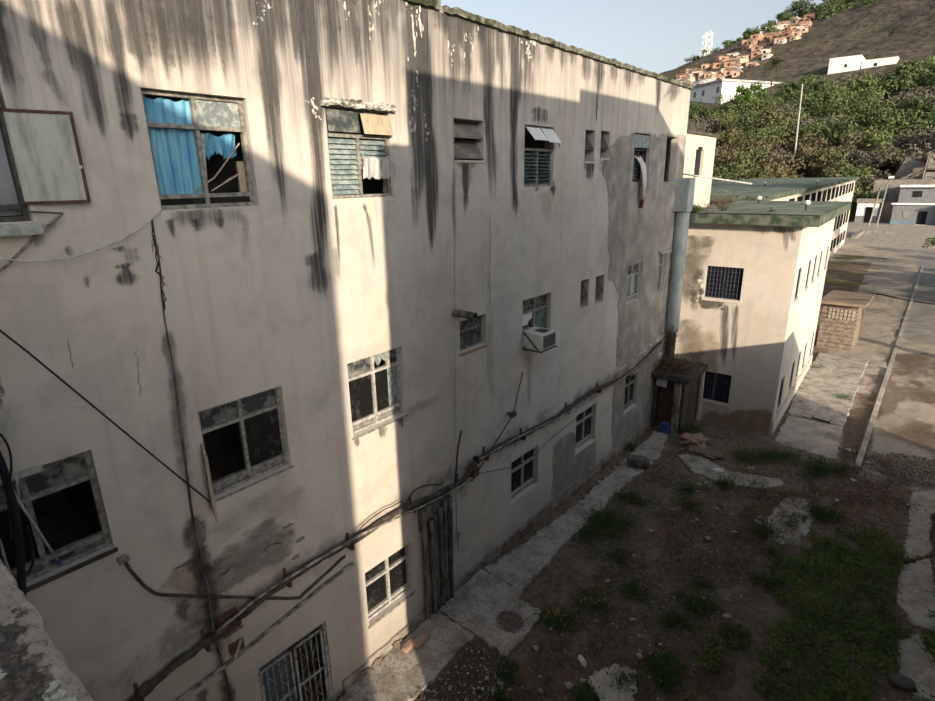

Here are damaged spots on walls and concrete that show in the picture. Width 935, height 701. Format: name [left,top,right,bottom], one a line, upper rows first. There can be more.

damp [56,0,104,131]
damp [107,0,233,137]
damp [255,0,388,289]
peeling [405,1,424,62]
peeling [409,70,429,141]
damp [396,0,535,244]
damp [547,49,633,87]
damp [656,79,677,107]
damp [722,306,738,359]
peeling [0,385,16,443]
damp [184,518,305,635]
damp [0,608,60,701]